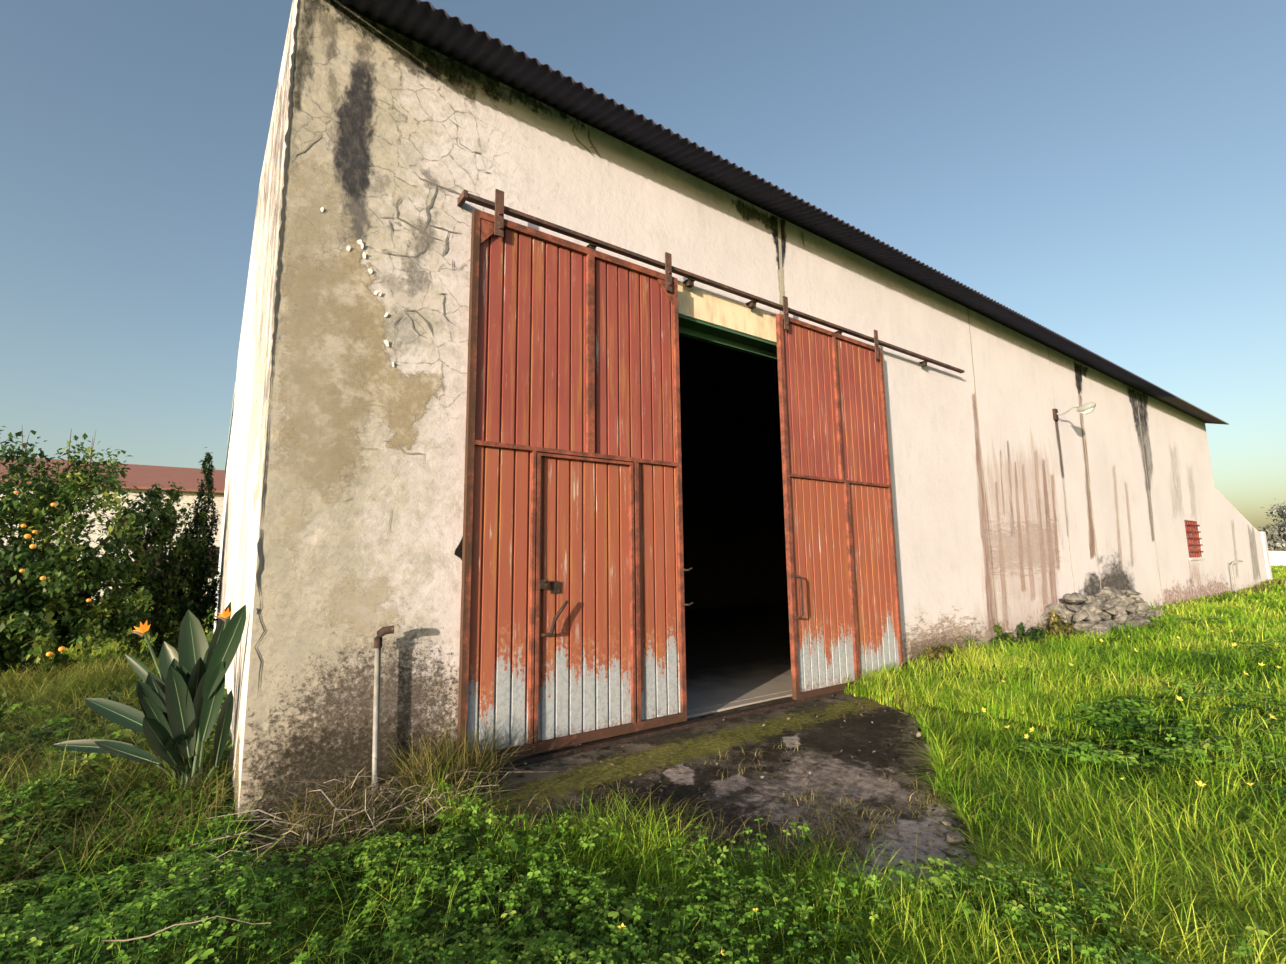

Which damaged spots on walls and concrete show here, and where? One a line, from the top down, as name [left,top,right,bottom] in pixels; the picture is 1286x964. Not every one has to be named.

peeling [272,159,444,503]
crack [368,176,464,348]
water stain [256,0,584,335]
crack [572,121,602,158]
rust [974,403,996,630]
water stain [1137,426,1154,541]
water stain [240,635,458,825]